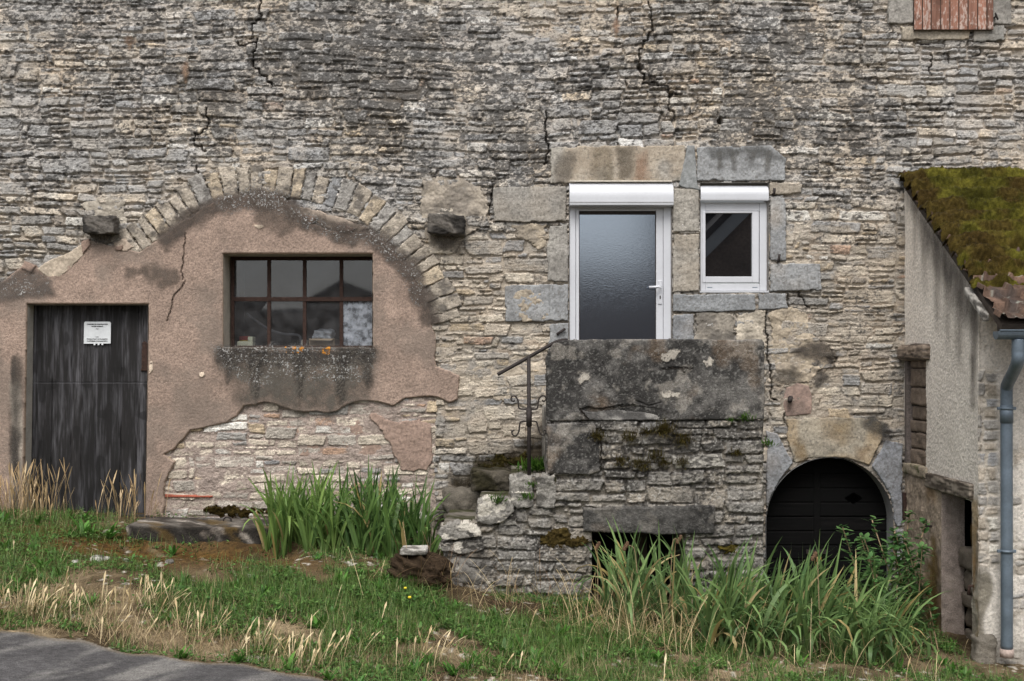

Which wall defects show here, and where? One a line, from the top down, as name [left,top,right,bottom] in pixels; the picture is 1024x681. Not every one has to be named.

crack [242,0,273,88]
crack [638,1,682,120]
damp [127,266,179,288]
damp [10,356,20,508]
damp [220,350,377,414]
flaking render [164,396,437,543]
crack [765,292,807,393]